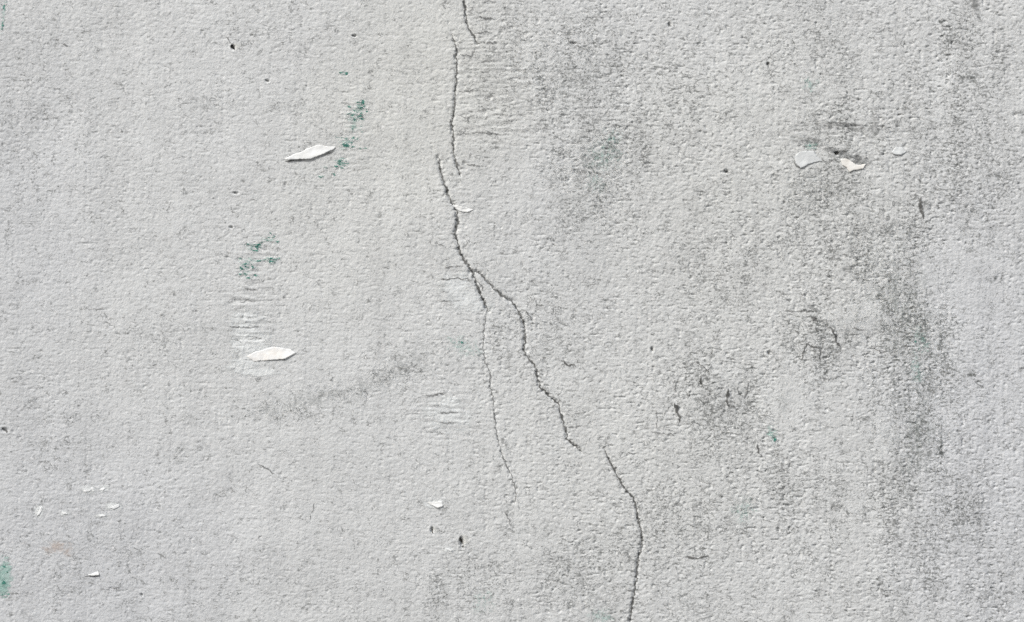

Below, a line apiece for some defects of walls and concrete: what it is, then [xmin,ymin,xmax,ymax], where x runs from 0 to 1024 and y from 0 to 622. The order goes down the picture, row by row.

peeling [285,145,336,162]
peeling [795,151,821,168]
peeling [840,158,866,172]
crack [435,0,652,622]
peeling [232,345,295,376]